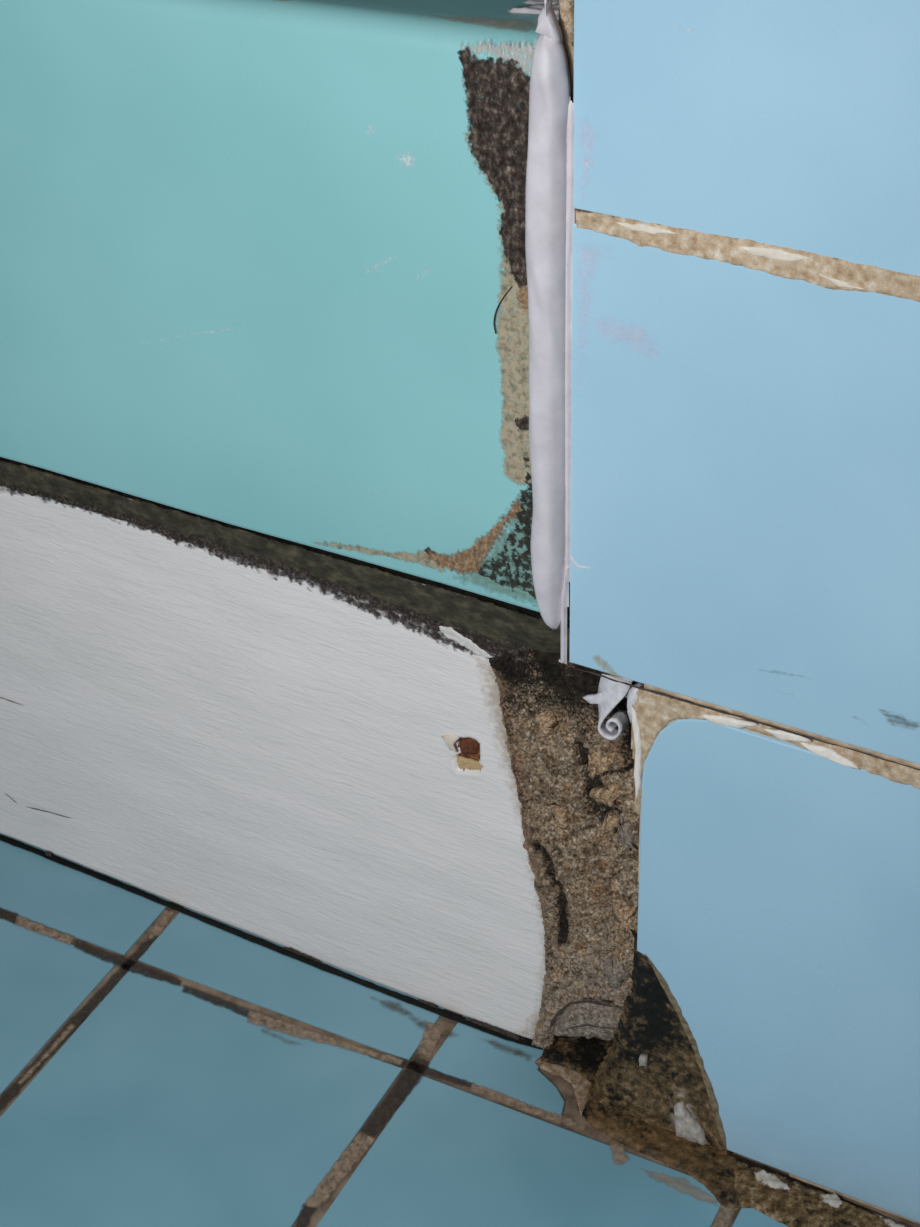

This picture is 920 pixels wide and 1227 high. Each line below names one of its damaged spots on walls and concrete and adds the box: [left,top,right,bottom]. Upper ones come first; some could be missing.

damp [0,40,570,702]
peeling [534,710,559,738]
peeling [588,752,639,851]
peeling [631,705,642,800]
spalling [535,903,754,1214]